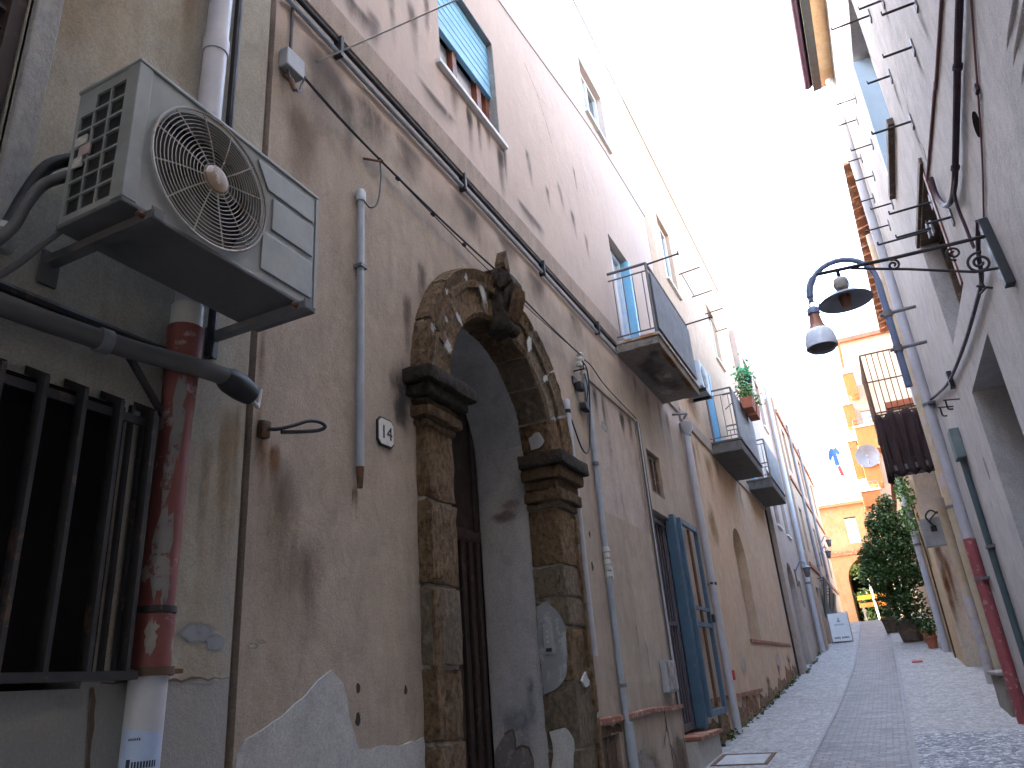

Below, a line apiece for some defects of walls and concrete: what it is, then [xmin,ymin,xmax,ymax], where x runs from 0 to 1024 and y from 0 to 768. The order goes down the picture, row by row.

peeling [495,729,534,768]